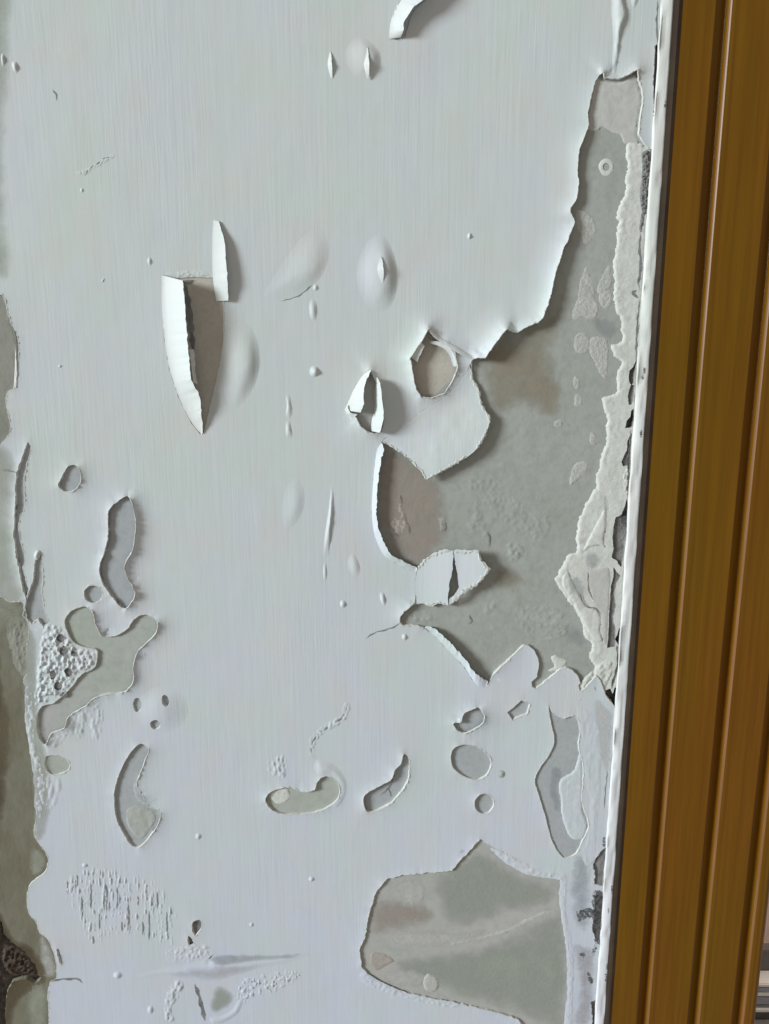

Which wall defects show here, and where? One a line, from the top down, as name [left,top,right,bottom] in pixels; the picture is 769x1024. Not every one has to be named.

peeling [0,293,20,445]
peeling [371,69,652,708]
peeling [57,464,83,493]
peeling [0,495,188,1024]
peeling [265,754,347,816]
peeling [362,754,411,813]
peeling [449,706,495,814]
peeling [534,706,590,858]
peeling [359,839,574,1024]